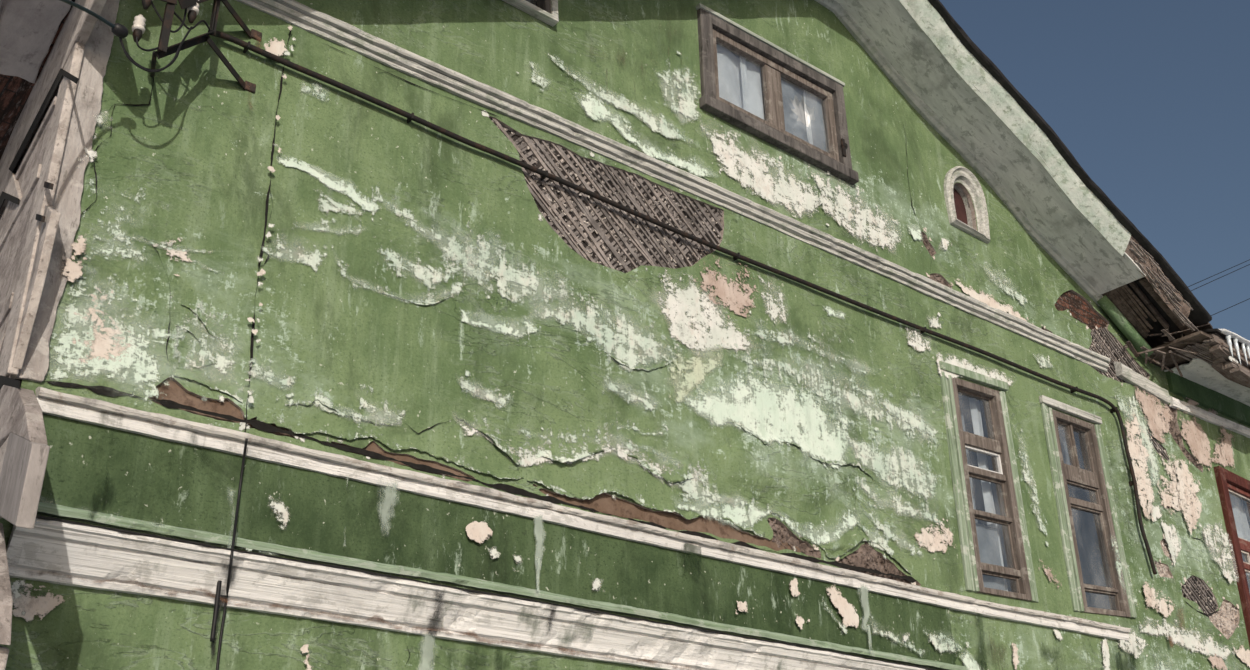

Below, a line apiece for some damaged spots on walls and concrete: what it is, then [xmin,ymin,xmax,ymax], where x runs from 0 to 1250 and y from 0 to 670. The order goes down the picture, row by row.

peeling [517,61,548,90]
peeling [548,51,952,259]
crack [0,24,917,583]
peeling [926,262,1046,330]
peeling [46,110,956,585]
peeling [905,312,1014,385]
peeling [1017,430,1048,546]
flaking render [1055,291,1250,670]
flaking render [11,579,68,622]
peeling [300,644,313,670]
peeling [790,578,800,597]
peeling [822,584,989,670]